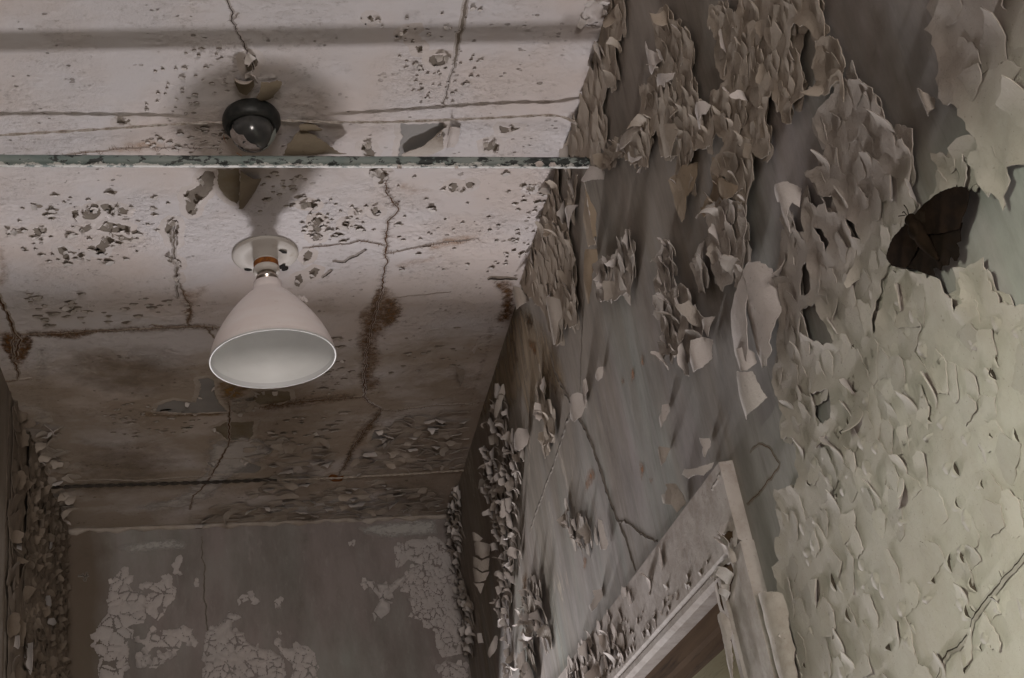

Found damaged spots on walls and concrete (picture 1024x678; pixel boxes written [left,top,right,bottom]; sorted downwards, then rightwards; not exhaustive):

crack [442,0,469,108]
crack [0,225,221,382]
peeling [0,167,433,289]
crack [259,171,478,476]
peeling [440,178,481,205]
peeling [486,0,1024,678]
peeling [6,401,82,678]
crack [74,388,247,510]
peeling [349,364,556,678]